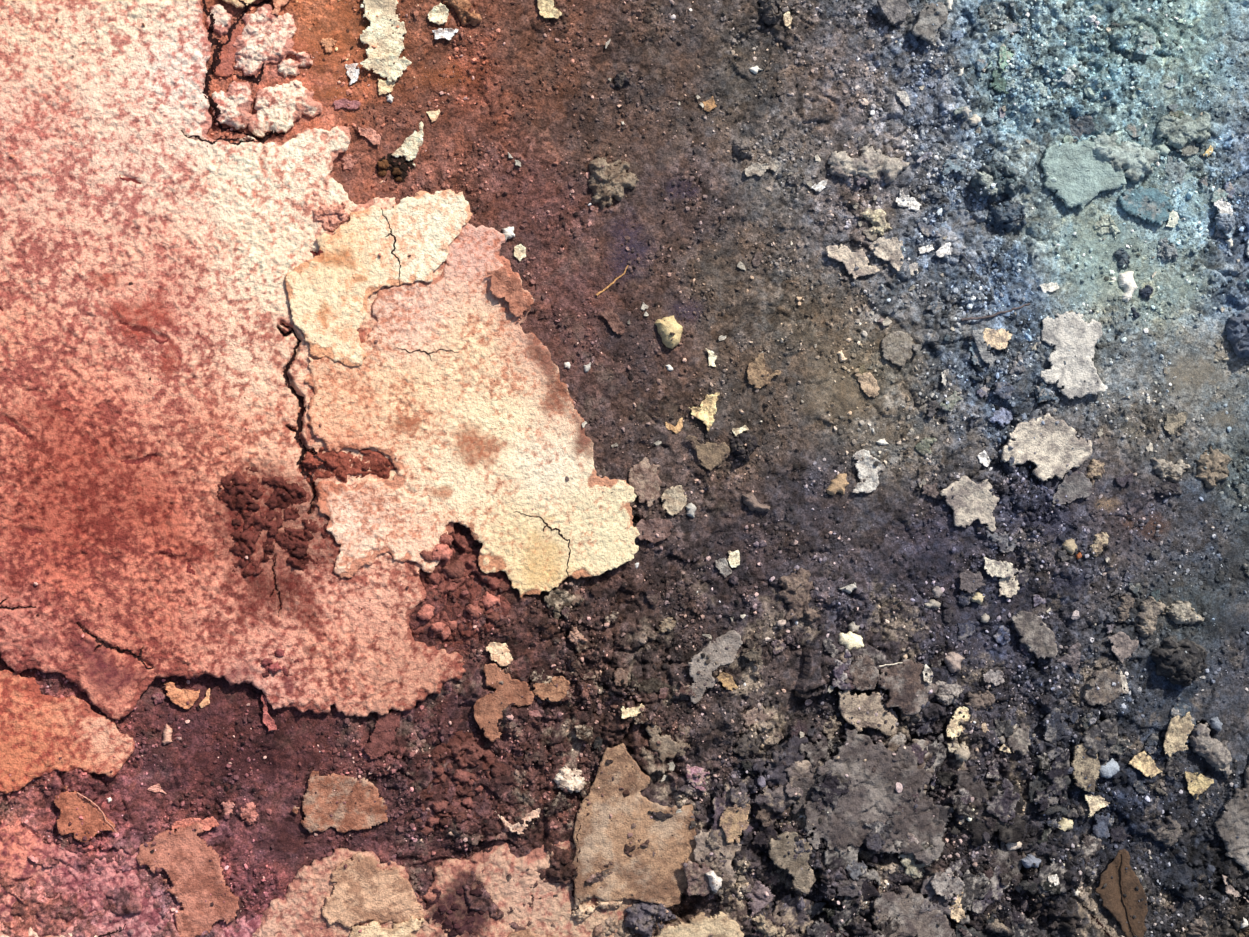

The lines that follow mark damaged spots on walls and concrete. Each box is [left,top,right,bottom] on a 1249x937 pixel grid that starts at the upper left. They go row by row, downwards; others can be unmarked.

crack [181,0,285,145]
crack [381,209,401,286]
crack [394,347,459,361]
crack [277,323,327,514]
spalling [121,453,158,465]
peeling [216,110,687,836]
spalling [158,548,196,575]
peeling [164,682,210,709]
peeling [54,786,118,842]
peeling [172,816,219,831]
spalling [426,885,485,937]